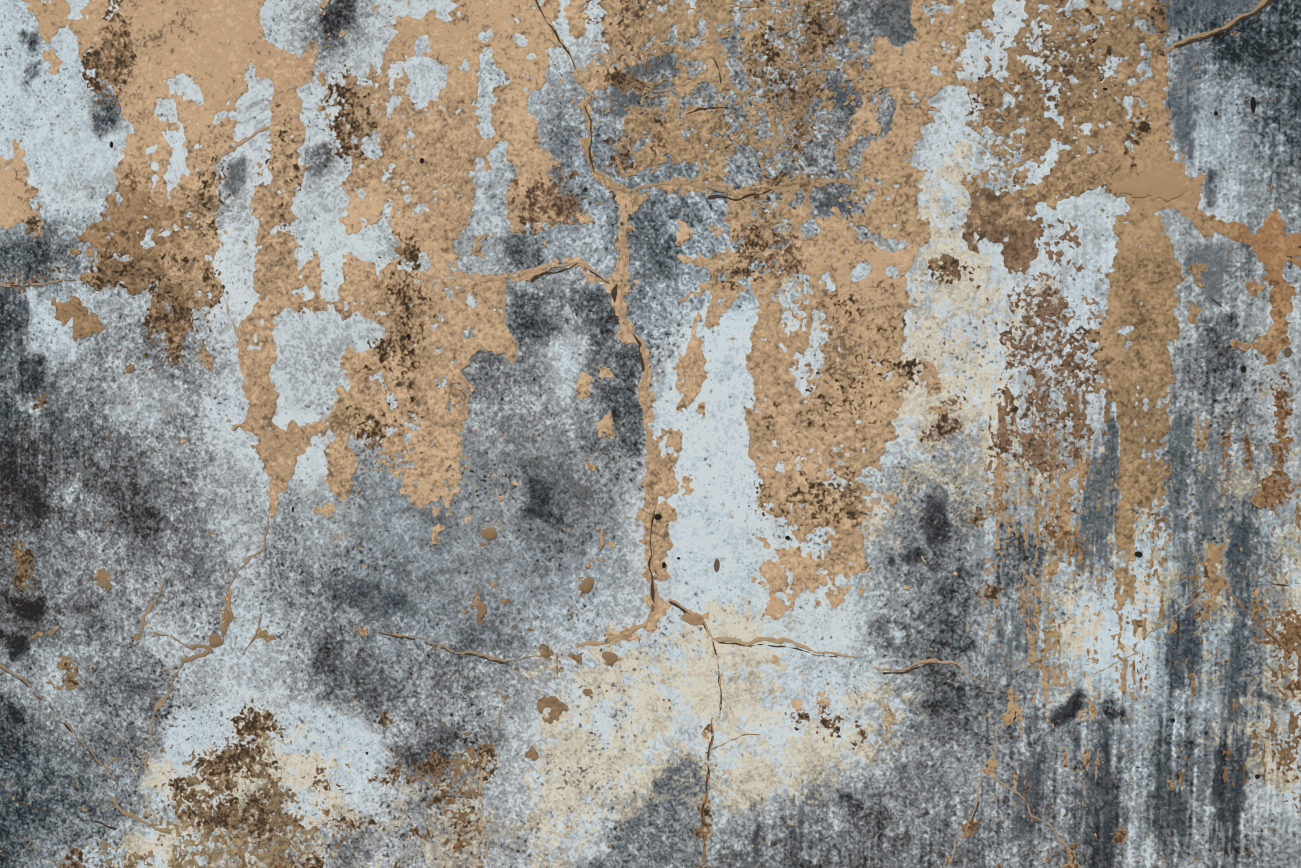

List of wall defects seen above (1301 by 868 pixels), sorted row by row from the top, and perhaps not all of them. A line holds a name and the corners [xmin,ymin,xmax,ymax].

crack [1164,0,1272,54]
peeling [27,290,77,363]
peeling [204,387,249,434]
crack [404,0,865,469]
crack [0,502,271,833]
crack [349,510,1083,868]